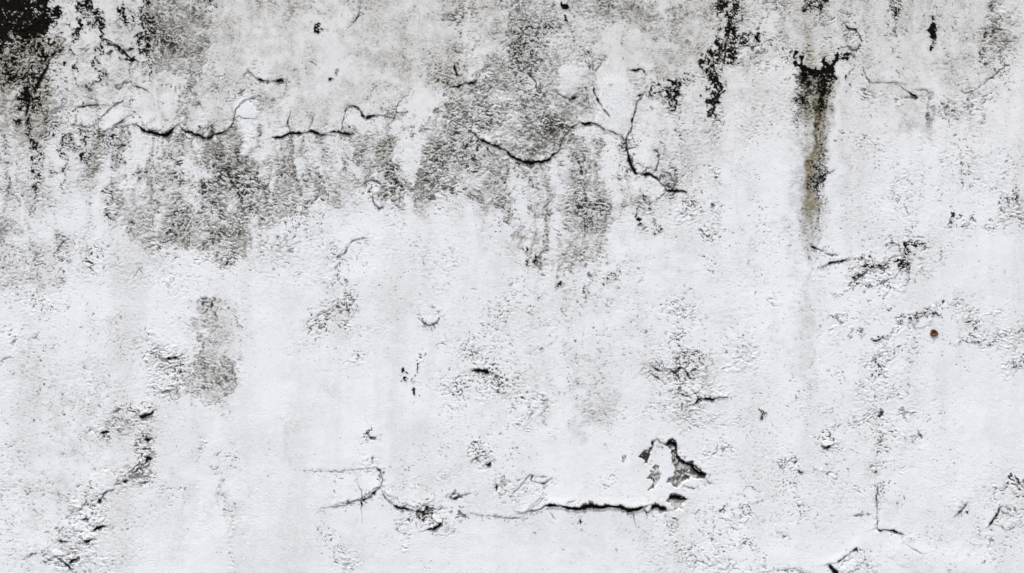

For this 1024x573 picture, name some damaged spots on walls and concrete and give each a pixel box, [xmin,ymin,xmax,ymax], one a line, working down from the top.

water stain [761,0,784,17]
water stain [0,0,159,295]
crack [48,71,408,140]
crack [471,56,688,193]
water stain [553,0,763,122]
water stain [522,246,549,267]
water stain [582,260,617,303]
water stain [780,46,855,412]
crack [309,467,667,526]
flaking render [638,438,712,531]